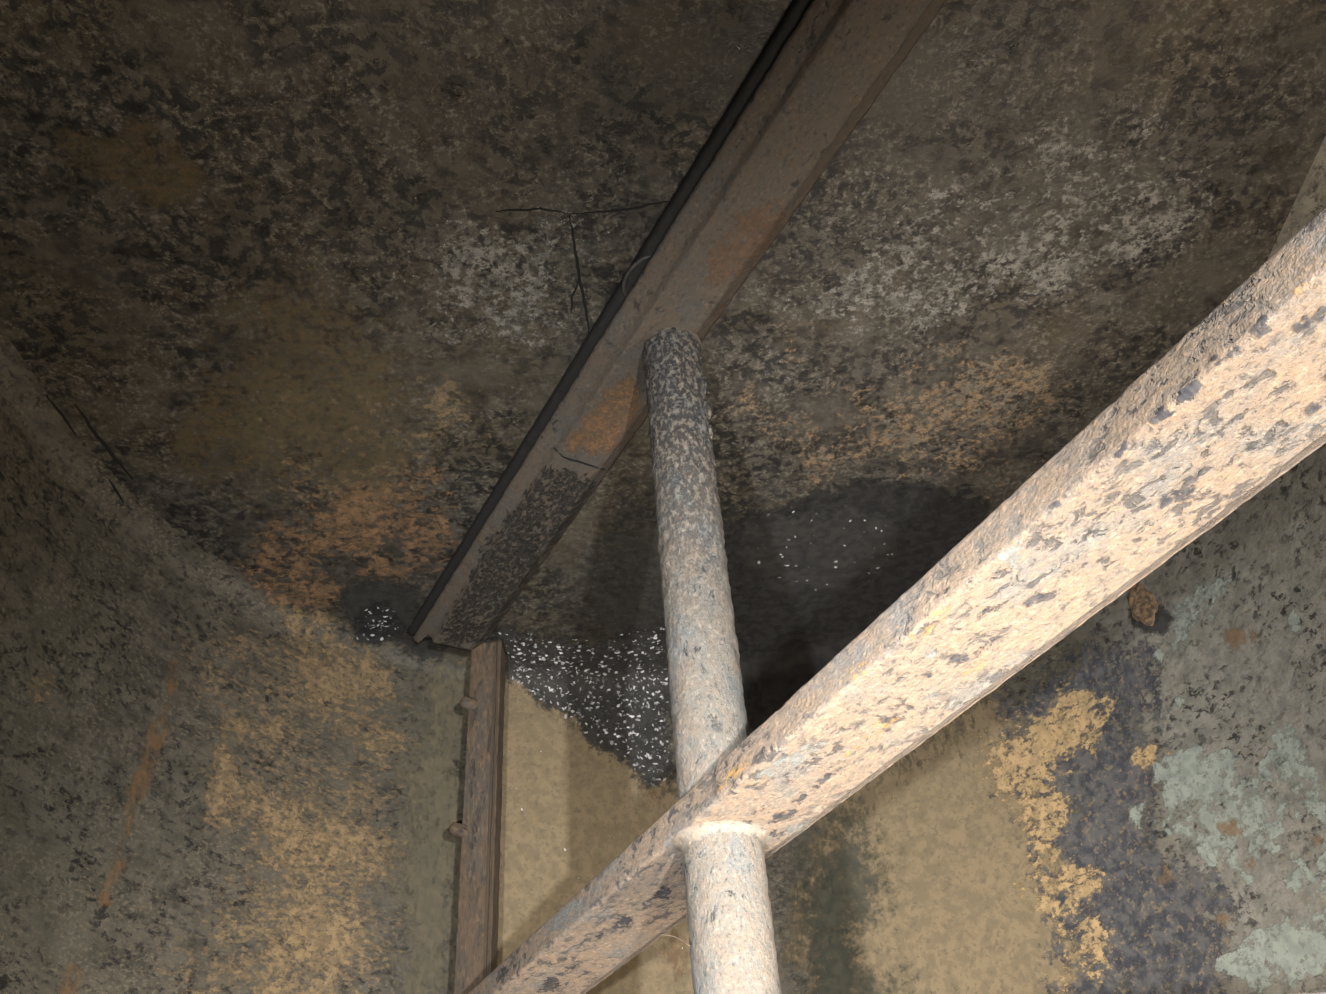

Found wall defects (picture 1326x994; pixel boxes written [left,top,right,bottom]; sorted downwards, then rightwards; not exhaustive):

corrosion [497,675,678,967]
corrosion [586,917,694,994]